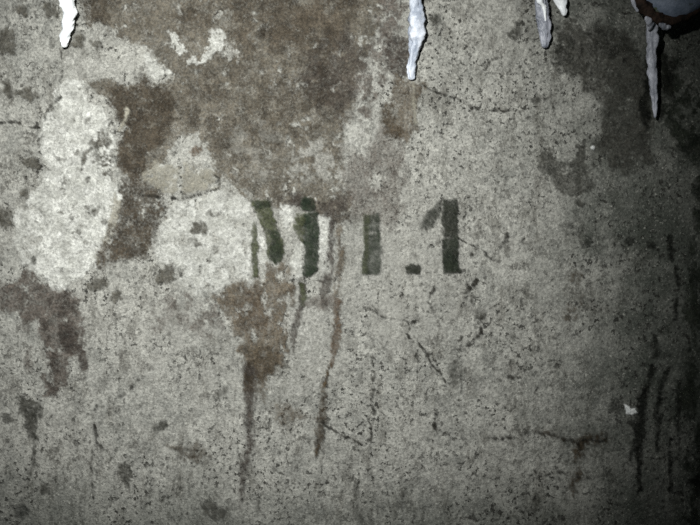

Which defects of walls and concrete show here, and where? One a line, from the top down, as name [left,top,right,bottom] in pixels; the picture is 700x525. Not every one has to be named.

damp [84,0,426,266]
damp [0,270,88,439]
corrosion [213,221,344,494]